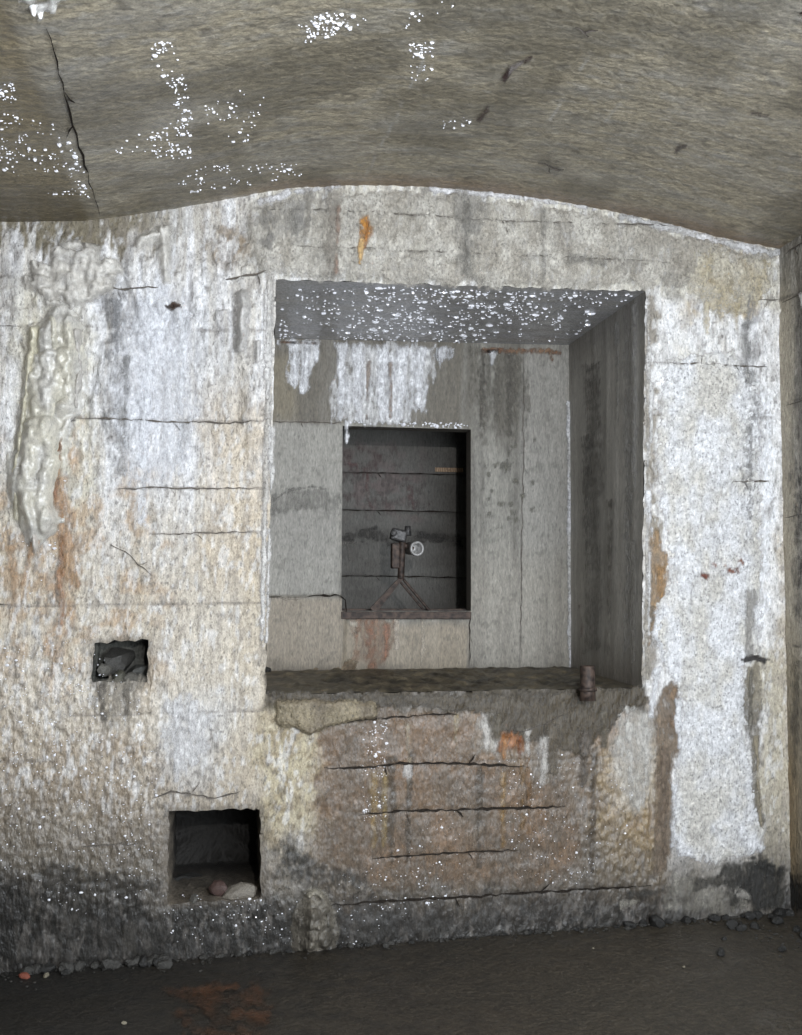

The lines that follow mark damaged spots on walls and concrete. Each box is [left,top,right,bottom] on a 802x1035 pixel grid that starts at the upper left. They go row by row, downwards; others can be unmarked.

crack [46,29,100,214]
corrosion [358,216,372,264]
leakage [248,186,802,935]
crack [324,755,526,774]
corrosion [498,731,532,811]
crack [361,805,563,820]
crack [373,849,518,860]